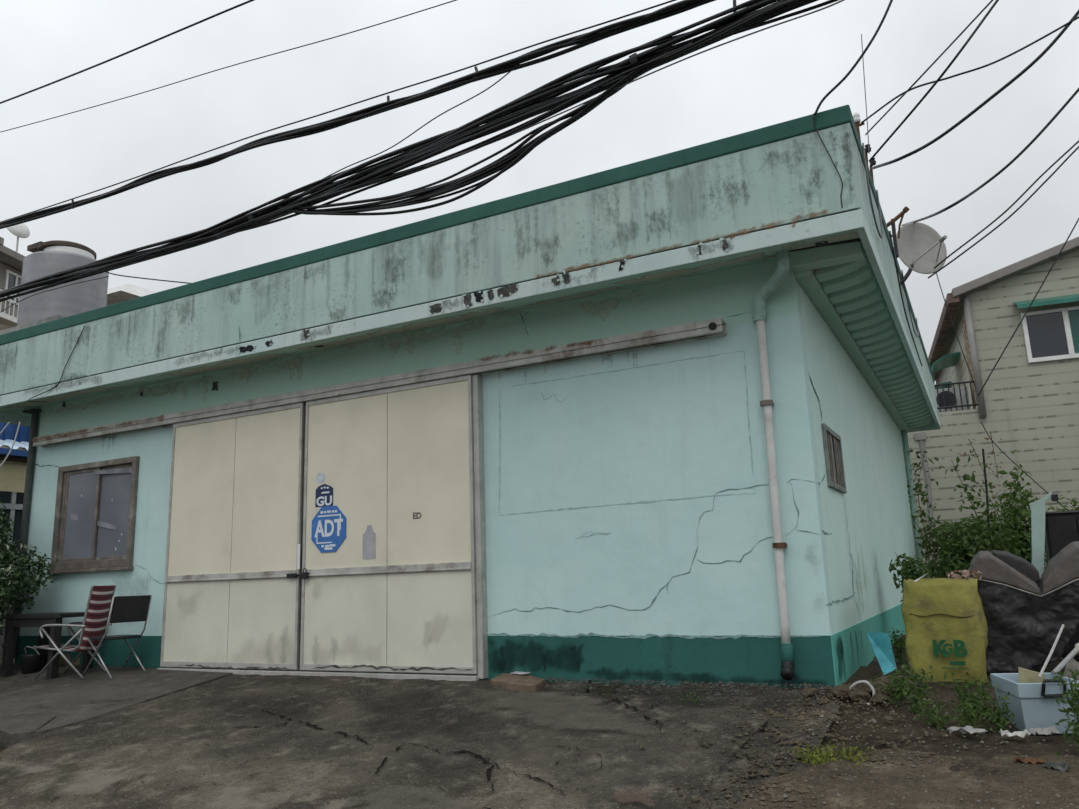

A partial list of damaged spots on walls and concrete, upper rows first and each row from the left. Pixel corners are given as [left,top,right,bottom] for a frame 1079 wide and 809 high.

rust [536,222,778,278]
peeling [525,232,859,306]
peeling [161,283,519,391]
crack [495,350,858,615]